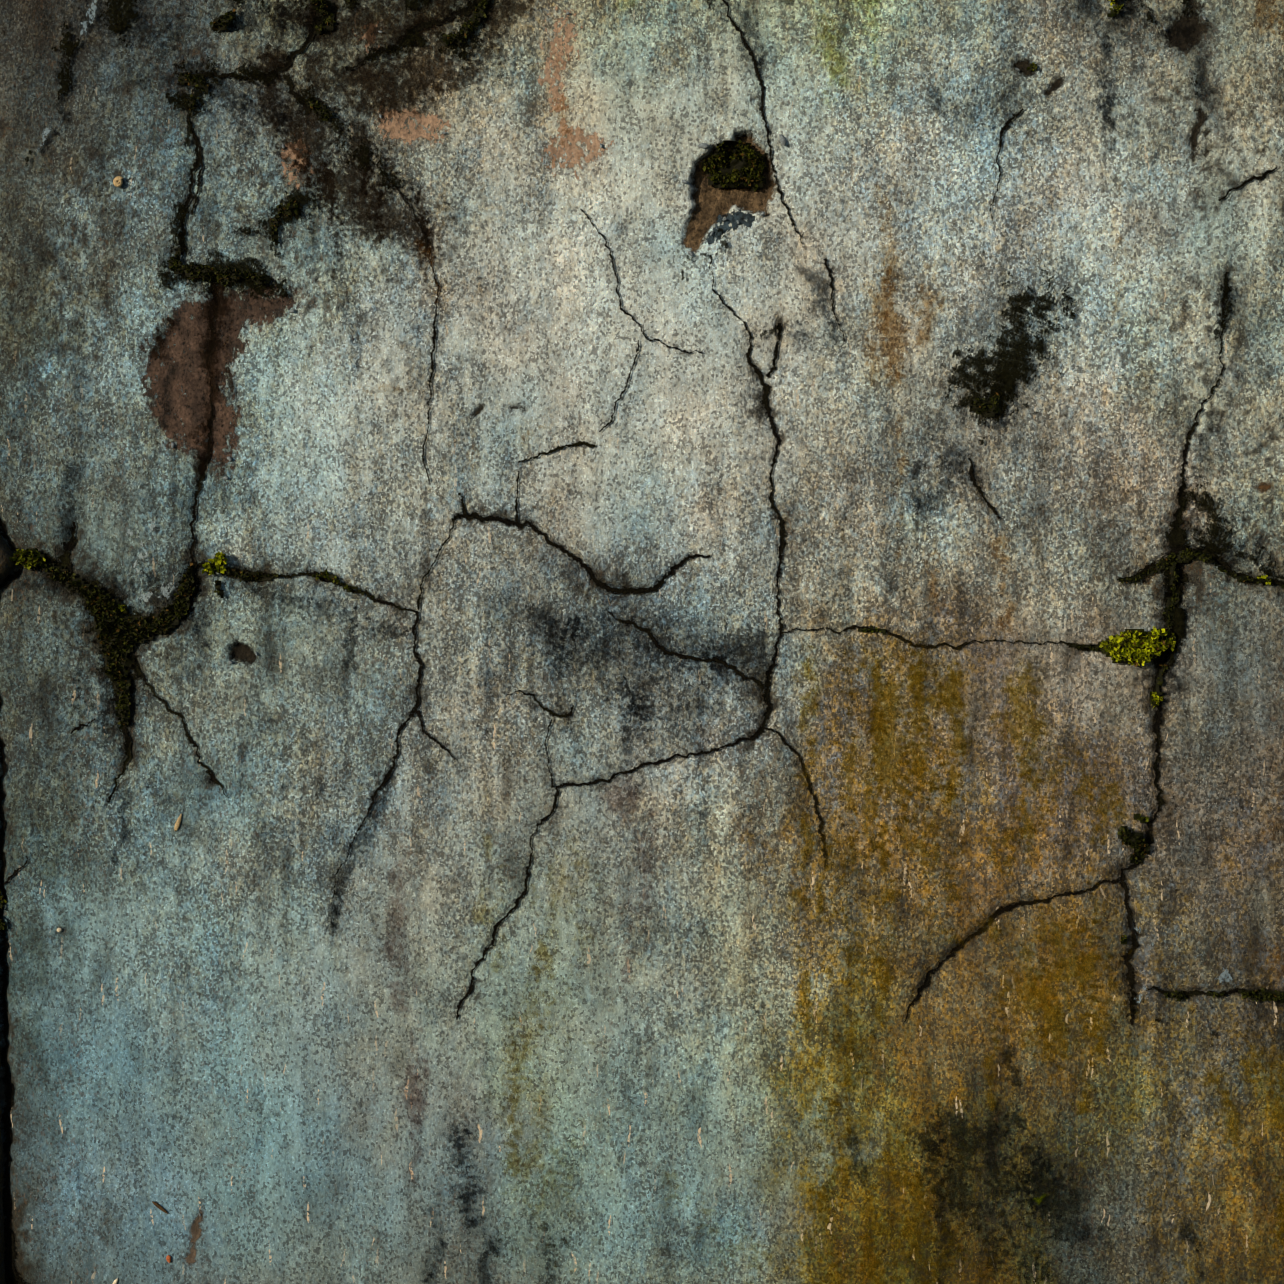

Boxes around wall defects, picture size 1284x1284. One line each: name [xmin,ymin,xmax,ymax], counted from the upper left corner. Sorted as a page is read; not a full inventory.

crack [178,6,336,252]
crack [345,0,479,71]
spalling [682,132,776,256]
crack [722,0,845,341]
crack [990,108,1024,221]
crack [1218,167,1277,201]
peeling [136,277,309,484]
damp [932,269,1078,445]
crack [0,174,1099,1020]
crack [903,271,1284,1025]
crack [0,741,33,1284]